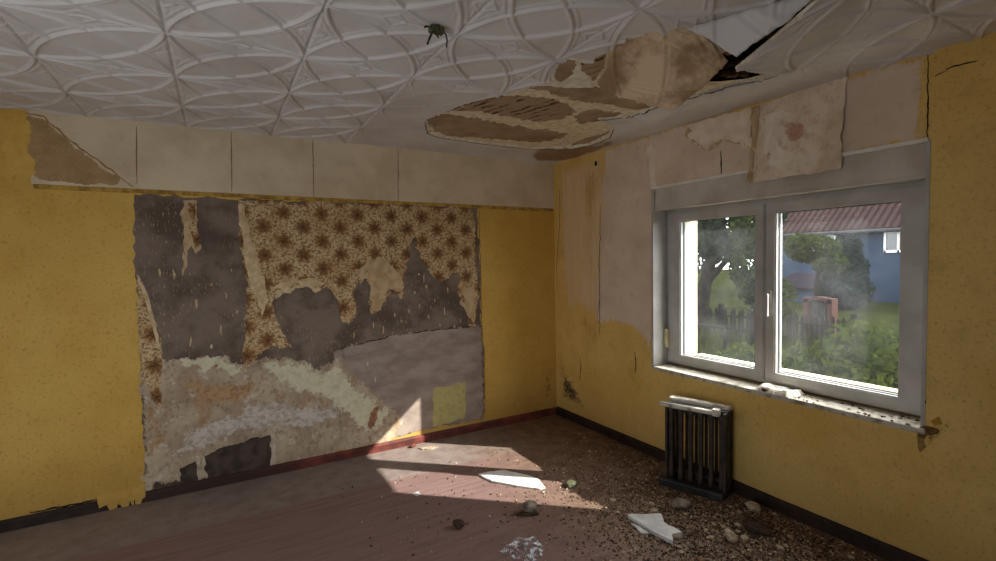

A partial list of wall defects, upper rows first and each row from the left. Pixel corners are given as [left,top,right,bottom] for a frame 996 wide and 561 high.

spalling [690,0,813,99]
crack [926,55,978,138]
peeling [424,31,927,347]
peeling [96,194,486,510]
flaking render [917,417,950,452]